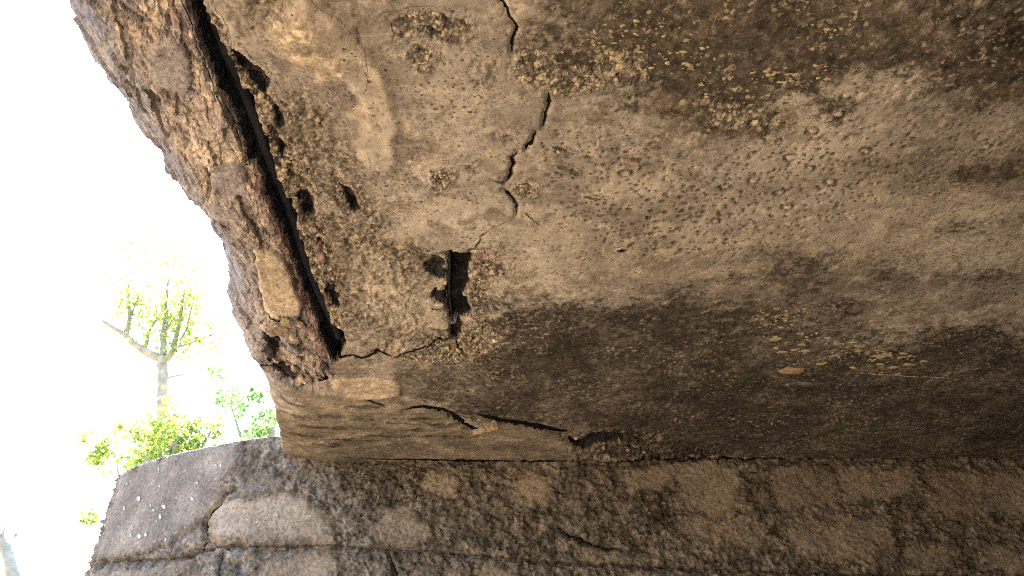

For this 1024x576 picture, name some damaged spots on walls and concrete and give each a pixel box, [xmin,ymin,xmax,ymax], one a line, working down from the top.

crack [500,0,518,52]
crack [466,92,551,253]
crack [315,308,460,381]
spalling [394,248,516,366]
damp [274,0,1024,520]
crack [342,399,840,464]